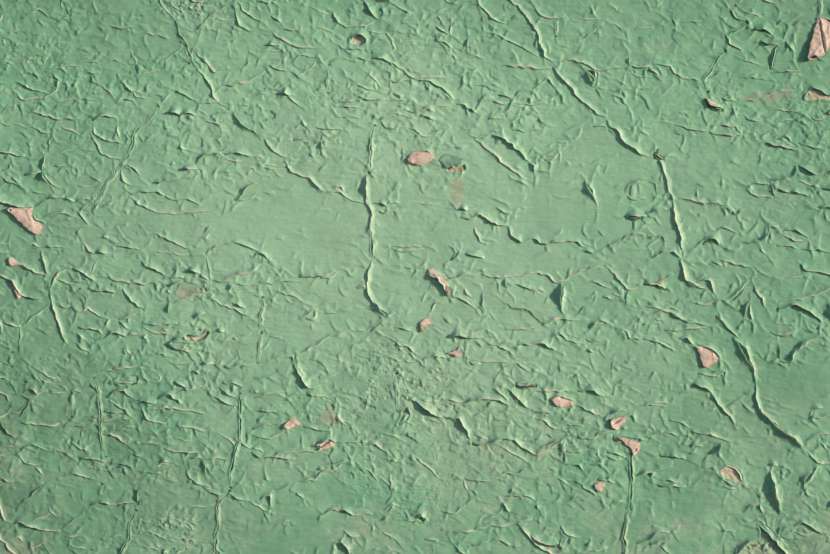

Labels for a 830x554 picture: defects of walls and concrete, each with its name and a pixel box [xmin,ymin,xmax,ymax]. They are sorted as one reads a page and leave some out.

crack [159,0,226,107]
peeling [808,14,830,61]
peeling [0,191,100,235]
crack [41,241,78,344]
crack [264,125,388,317]
peeling [383,263,476,363]
crack [508,0,830,515]
peeling [679,333,722,368]
crack [202,377,252,554]
peeling [550,392,640,455]
crack [614,434,639,554]
peeling [734,519,793,554]